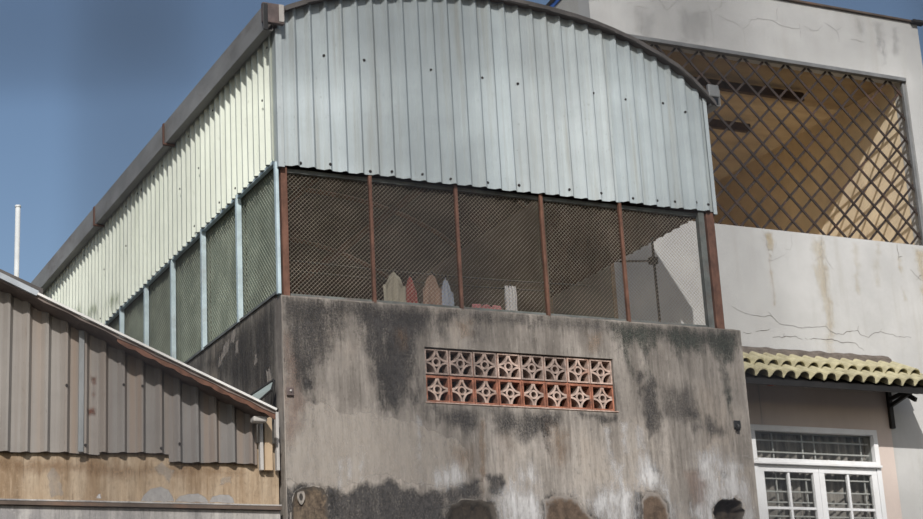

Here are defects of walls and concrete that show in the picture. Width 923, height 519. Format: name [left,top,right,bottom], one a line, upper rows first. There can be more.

crack [741,311,911,348]
leakage [208,309,273,402]
leakage [288,301,418,409]
leakage [497,412,559,440]
leakage [326,479,427,519]
leakage [457,464,540,519]
spalling [713,499,729,519]